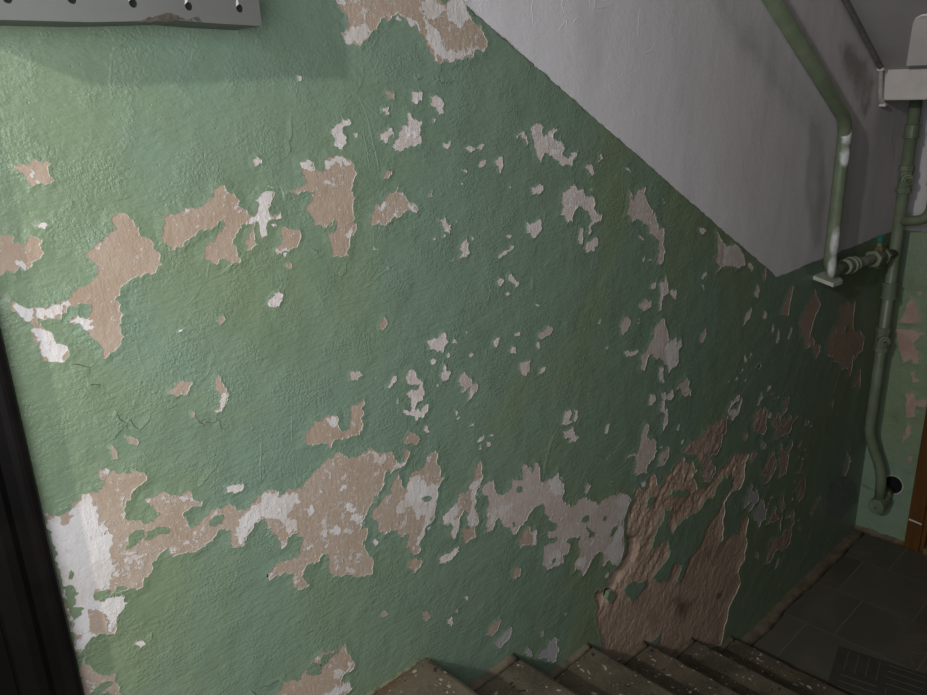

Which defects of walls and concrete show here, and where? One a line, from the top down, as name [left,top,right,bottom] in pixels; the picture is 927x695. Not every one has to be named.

peeling [328,0,493,73]
peeling [0,77,446,373]
peeling [459,142,505,186]
peeling [513,115,606,255]
peeling [42,181,812,695]
peeling [697,225,866,392]
peeling [891,291,927,445]